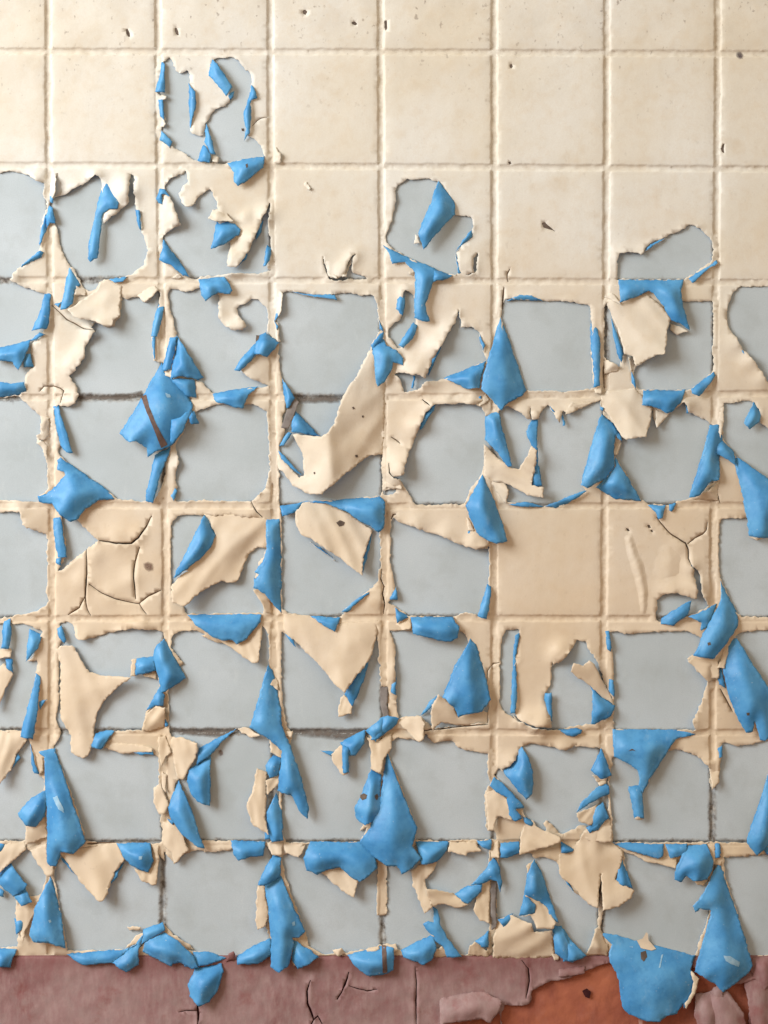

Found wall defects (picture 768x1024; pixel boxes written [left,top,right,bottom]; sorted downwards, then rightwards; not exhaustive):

peeling [155,57,281,186]
peeling [383,178,473,348]
crack [68,516,161,615]
peeling [0,171,403,1007]
peeling [164,225,768,1024]
crack [656,517,707,562]
crack [306,972,375,1024]